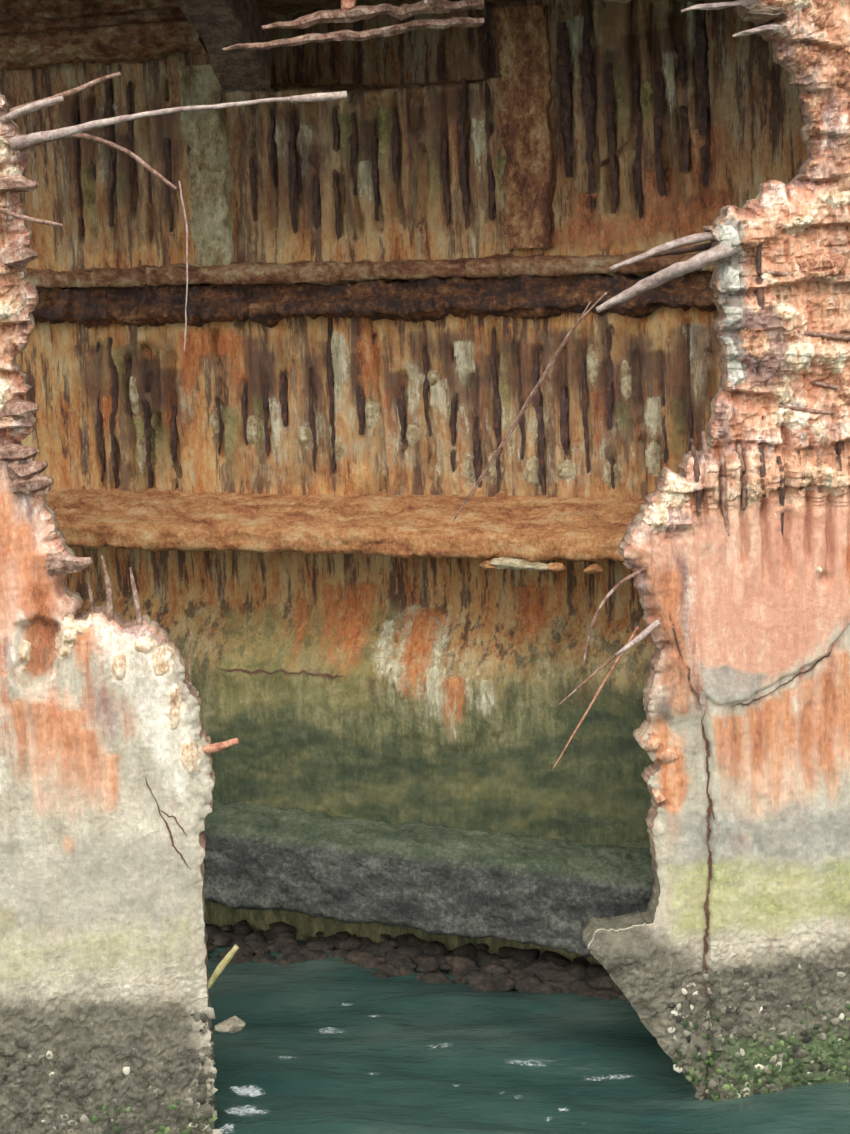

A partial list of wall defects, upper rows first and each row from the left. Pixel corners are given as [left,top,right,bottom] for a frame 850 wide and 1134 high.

peeling [210,0,850,948]
rust [0,483,50,635]
rust [11,699,115,798]
crack [145,778,192,870]
damp [375,606,494,735]
rust [635,547,688,813]
crack [668,612,836,997]
rust [714,653,850,811]
damp [588,924,850,1102]